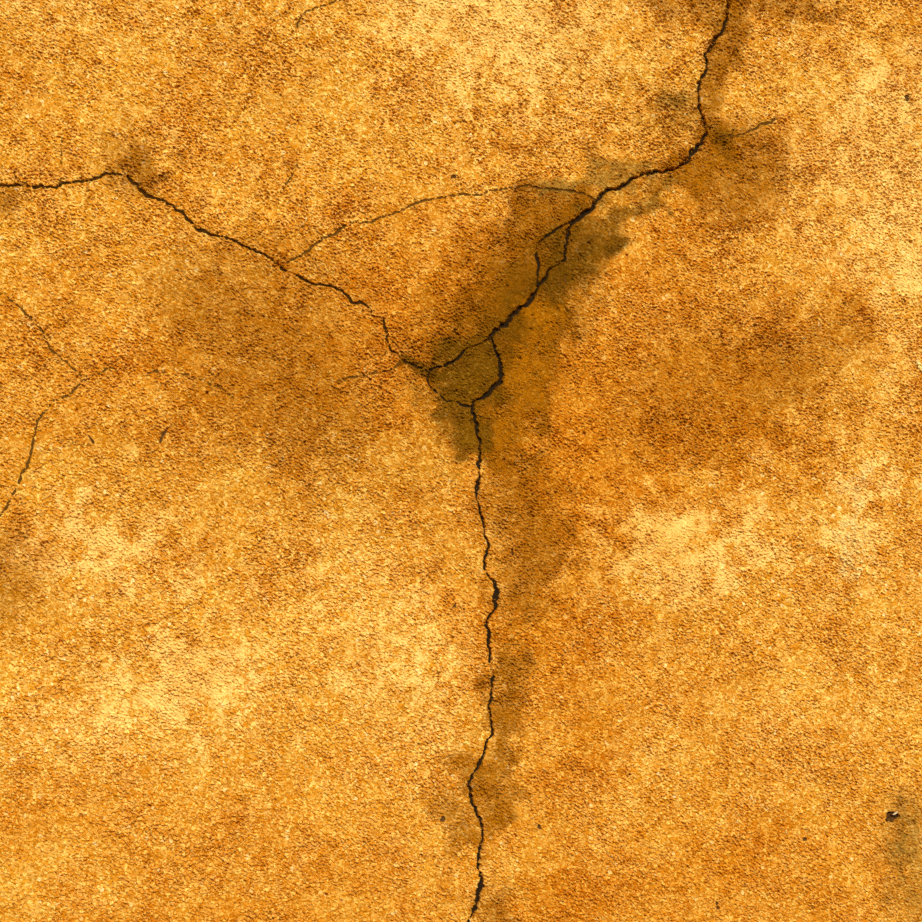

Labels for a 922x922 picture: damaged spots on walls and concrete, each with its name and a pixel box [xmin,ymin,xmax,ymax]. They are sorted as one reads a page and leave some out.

crack [0,0,777,665]
damp [400,193,658,461]
crack [467,675,494,922]